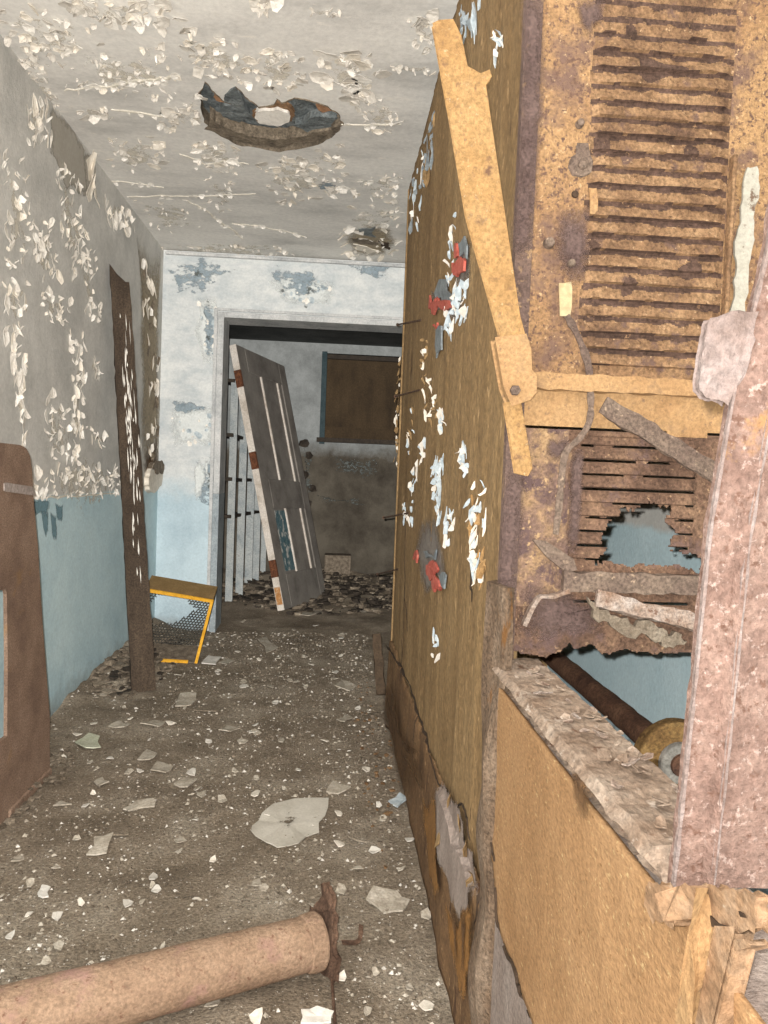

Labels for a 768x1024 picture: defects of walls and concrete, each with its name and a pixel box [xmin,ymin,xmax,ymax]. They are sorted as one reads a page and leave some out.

rust [578,2,601,31]
rust [514,3,542,246]
spalling [0,0,439,554]
peeling [393,212,487,592]
rust [548,439,567,457]
rust [499,477,523,587]
peeling [431,627,440,663]
crack [386,524,495,862]
rust [531,589,695,635]
rust [573,774,587,813]
peeling [434,784,477,918]